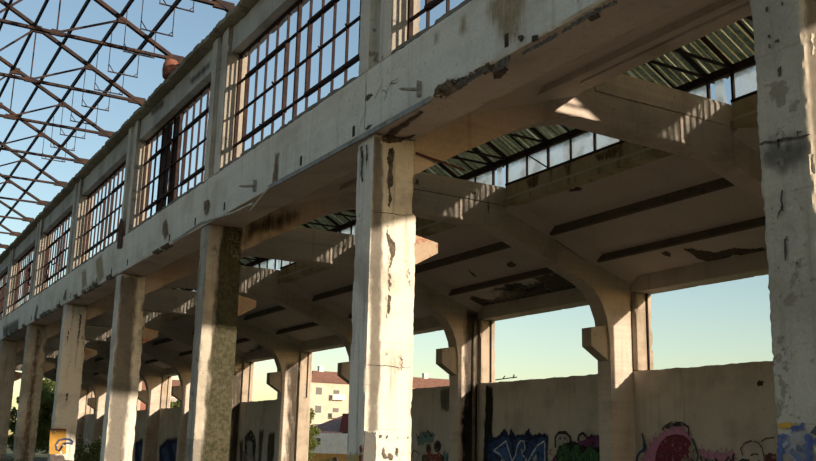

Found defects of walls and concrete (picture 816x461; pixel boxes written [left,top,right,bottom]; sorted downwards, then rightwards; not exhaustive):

spalling [522,0,618,55]
spalling [433,55,511,99]
peeling [381,111,423,207]
crack [759,131,810,148]
peeling [386,225,398,318]
peeling [651,246,767,261]
water stain [201,213,296,461]
water stain [461,273,577,461]